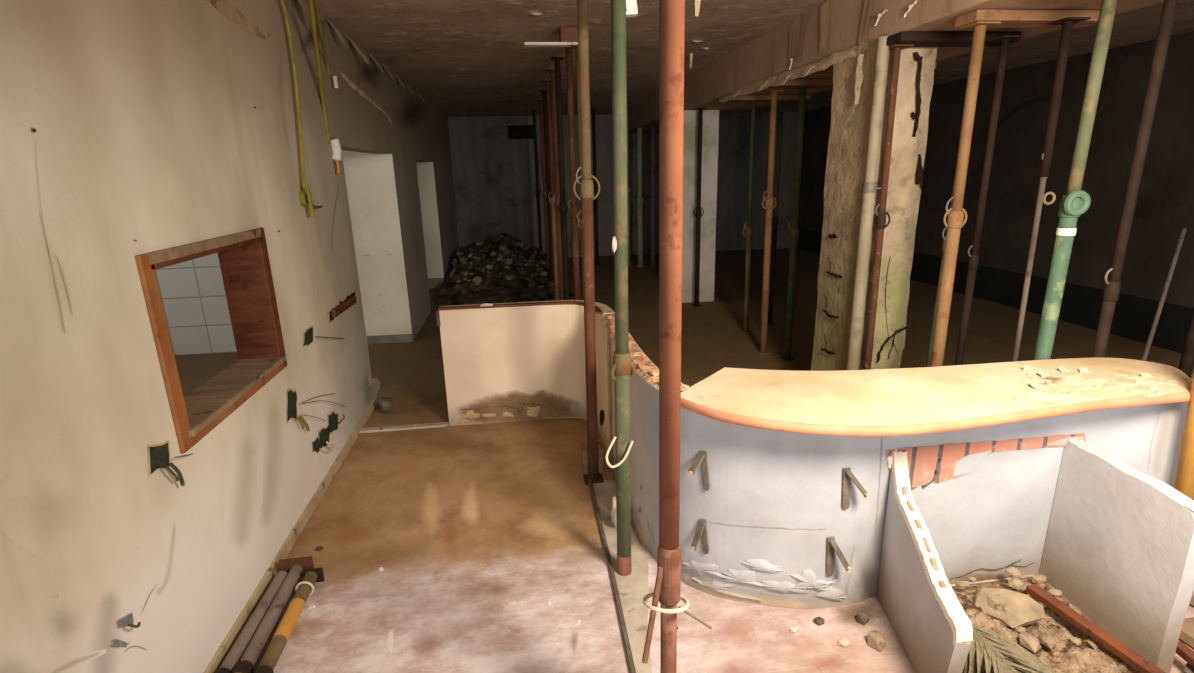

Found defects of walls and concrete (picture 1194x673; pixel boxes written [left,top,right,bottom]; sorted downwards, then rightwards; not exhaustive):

crack [821,257,842,355]
crack [877,318,916,363]
leakage [399,387,586,460]
spalling [886,433,1194,645]